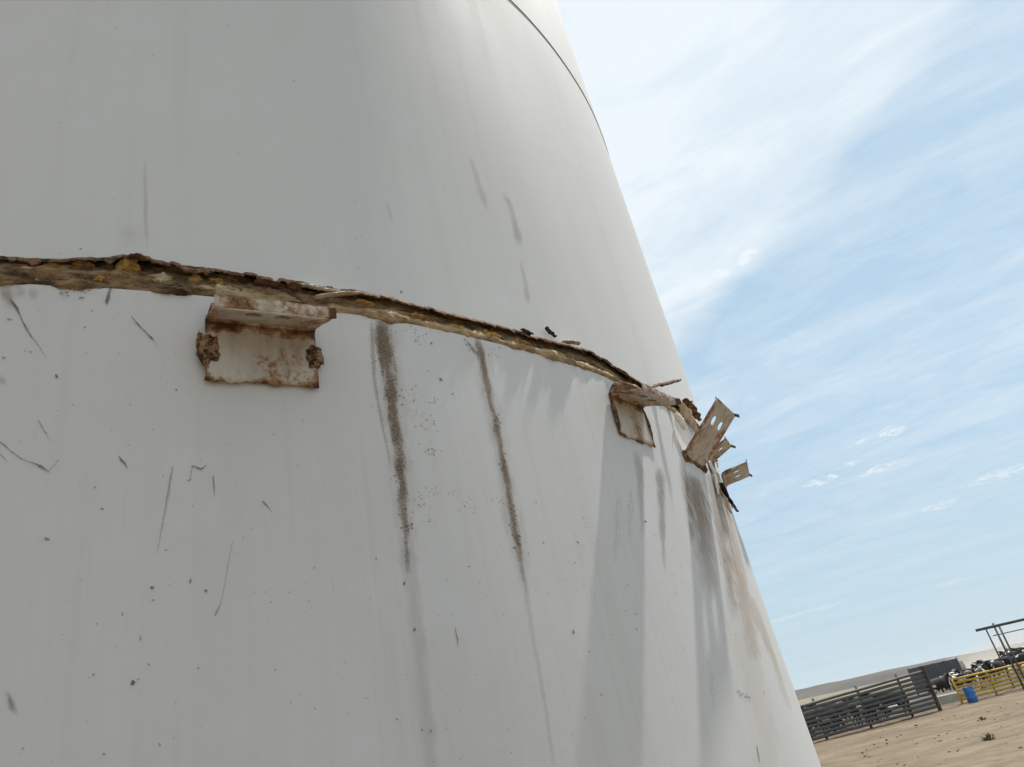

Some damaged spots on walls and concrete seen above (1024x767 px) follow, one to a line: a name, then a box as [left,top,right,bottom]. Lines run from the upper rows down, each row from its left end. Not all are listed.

peeling [126,253,147,261]
peeling [255,276,362,300]
peeling [520,326,581,345]
peeling [651,379,682,388]
peeling [674,398,702,433]
peeling [708,460,739,514]